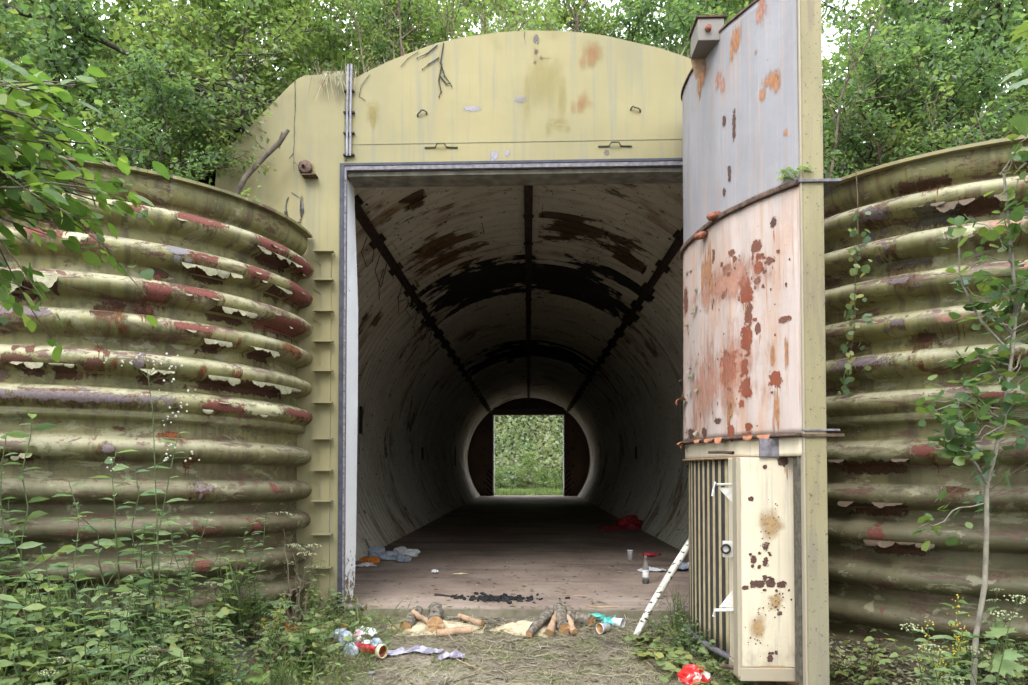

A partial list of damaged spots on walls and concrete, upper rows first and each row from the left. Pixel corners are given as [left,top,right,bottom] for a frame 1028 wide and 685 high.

corrosion [730,29,740,59]
corrosion [699,68,724,97]
corrosion [759,70,779,100]
peeling [62,232,88,241]
peeling [906,194,1012,240]
peeling [166,246,243,285]
peeling [9,275,60,296]
corrosion [675,216,792,442]
peeling [0,353,177,410]
peeling [182,375,301,418]
corrosion [763,457,789,475]
corrosion [742,499,792,668]